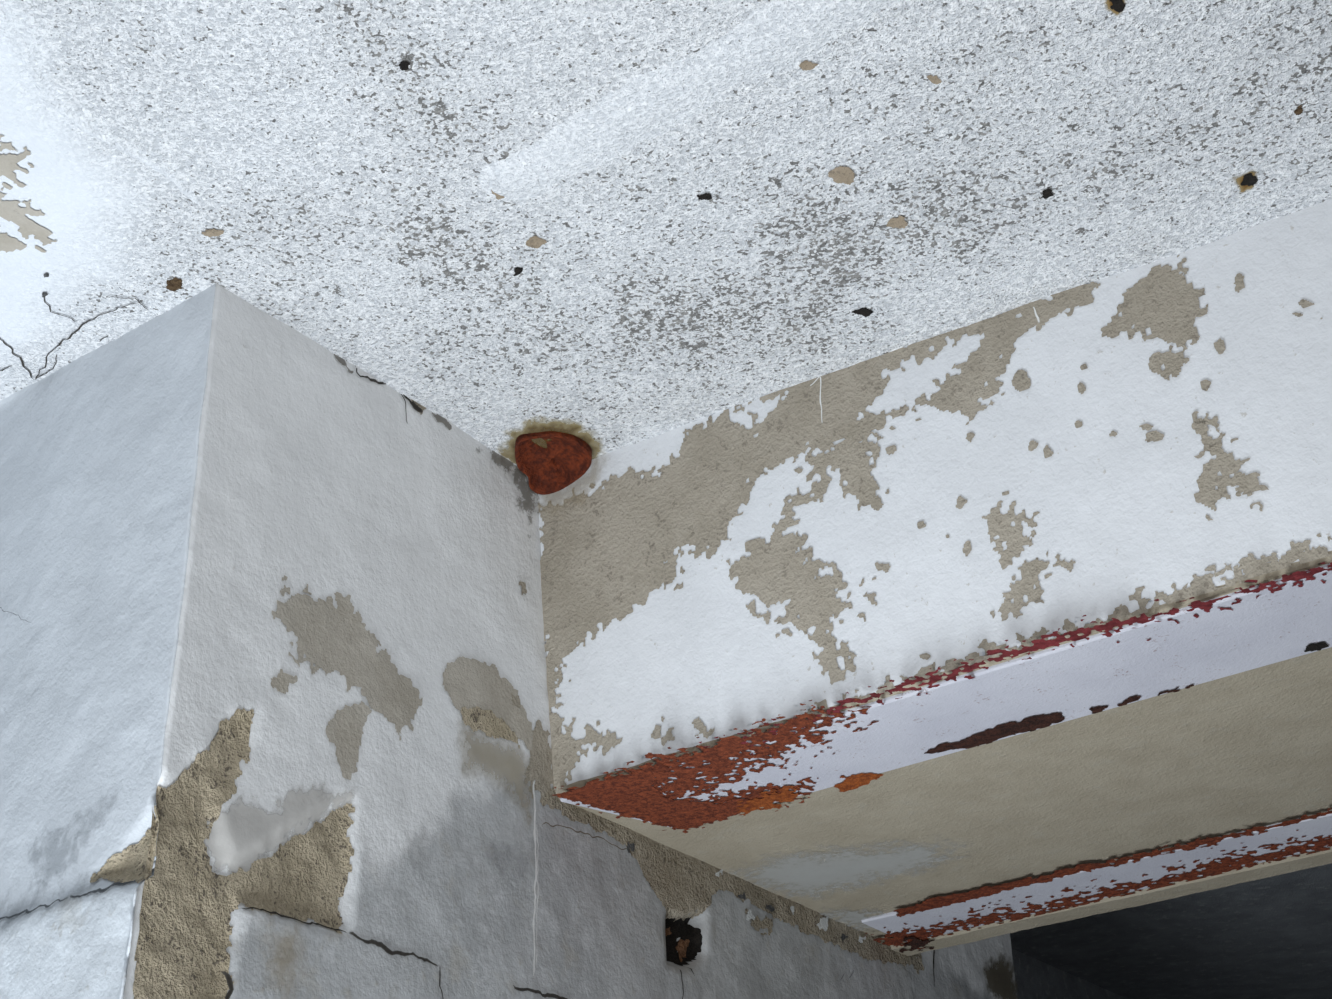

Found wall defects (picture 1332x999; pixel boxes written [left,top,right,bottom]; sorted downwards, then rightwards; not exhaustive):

peeling [0,135,57,253]
peeling [1101,255,1226,381]
rust [478,419,600,523]
peeling [443,282,1332,974]
spalling [90,575,423,999]
rust [552,699,884,833]
rust [924,712,1065,754]
rust [1089,695,1141,714]
rust [866,808,1332,953]
crack [222,971,234,999]
crack [242,907,443,998]
crack [513,985,567,999]